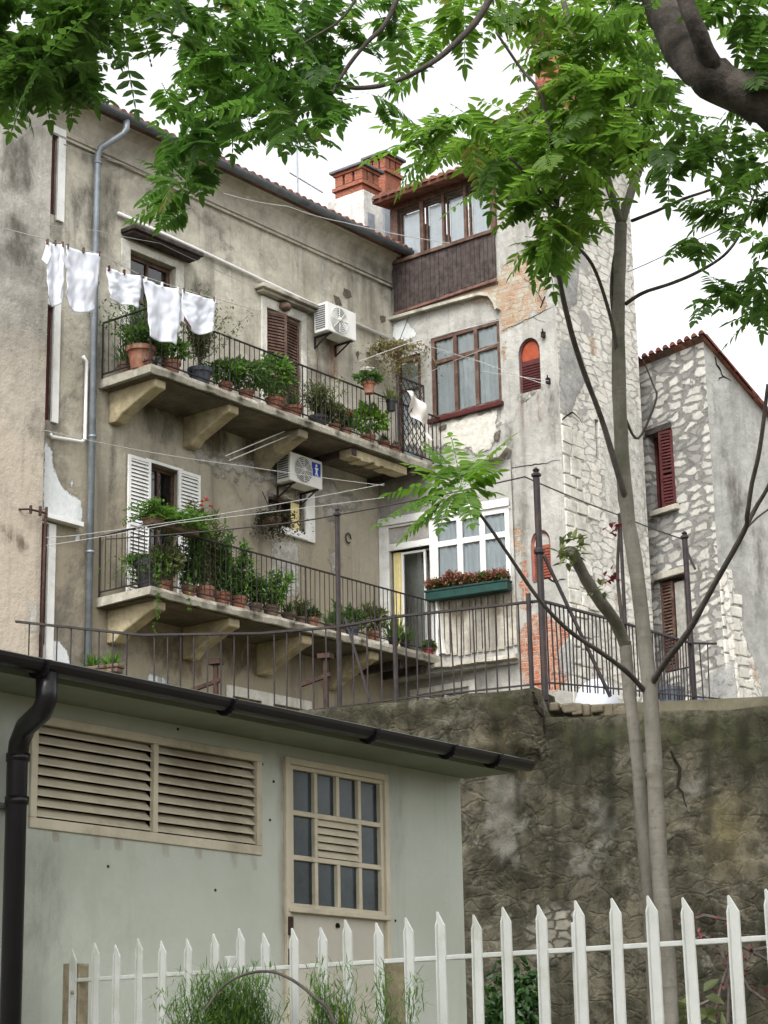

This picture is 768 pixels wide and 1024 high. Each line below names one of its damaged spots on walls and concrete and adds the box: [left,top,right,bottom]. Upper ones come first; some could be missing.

flaking render [449,253,548,361]
flaking render [513,528,568,693]
crack [670,751,687,808]